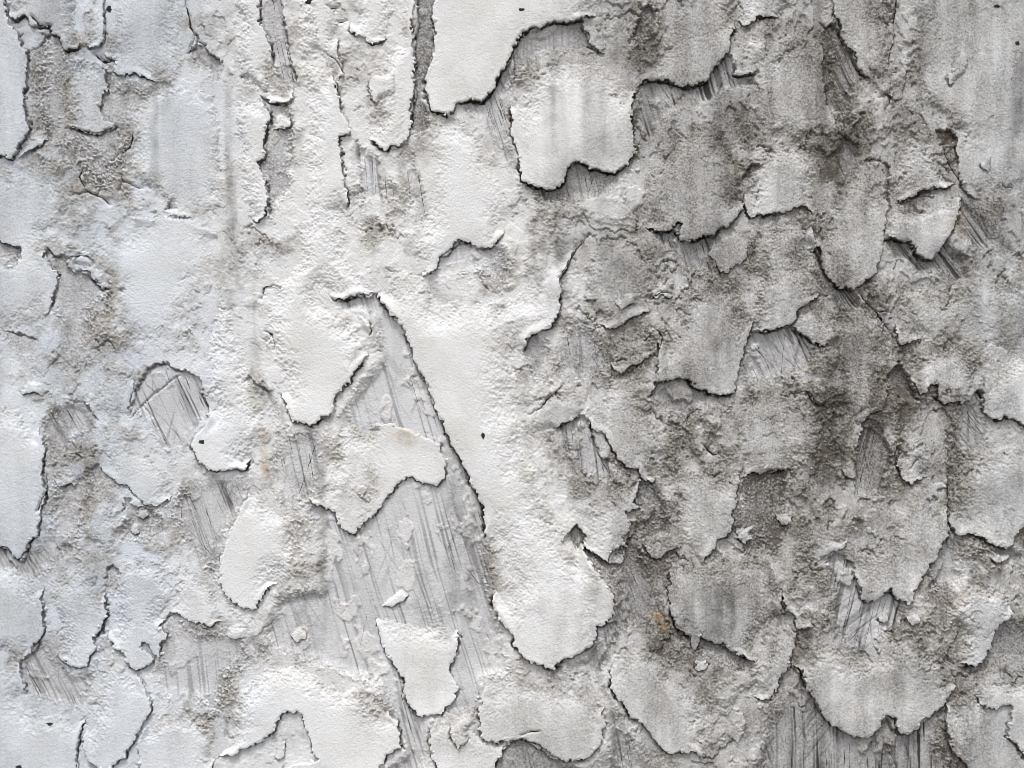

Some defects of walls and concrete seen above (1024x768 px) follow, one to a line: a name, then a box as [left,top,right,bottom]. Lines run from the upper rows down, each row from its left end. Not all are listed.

peeling [0,0,229,372]
peeling [19,379,45,396]
spalling [0,401,269,768]
peeling [130,301,325,610]
spalling [216,0,1024,768]